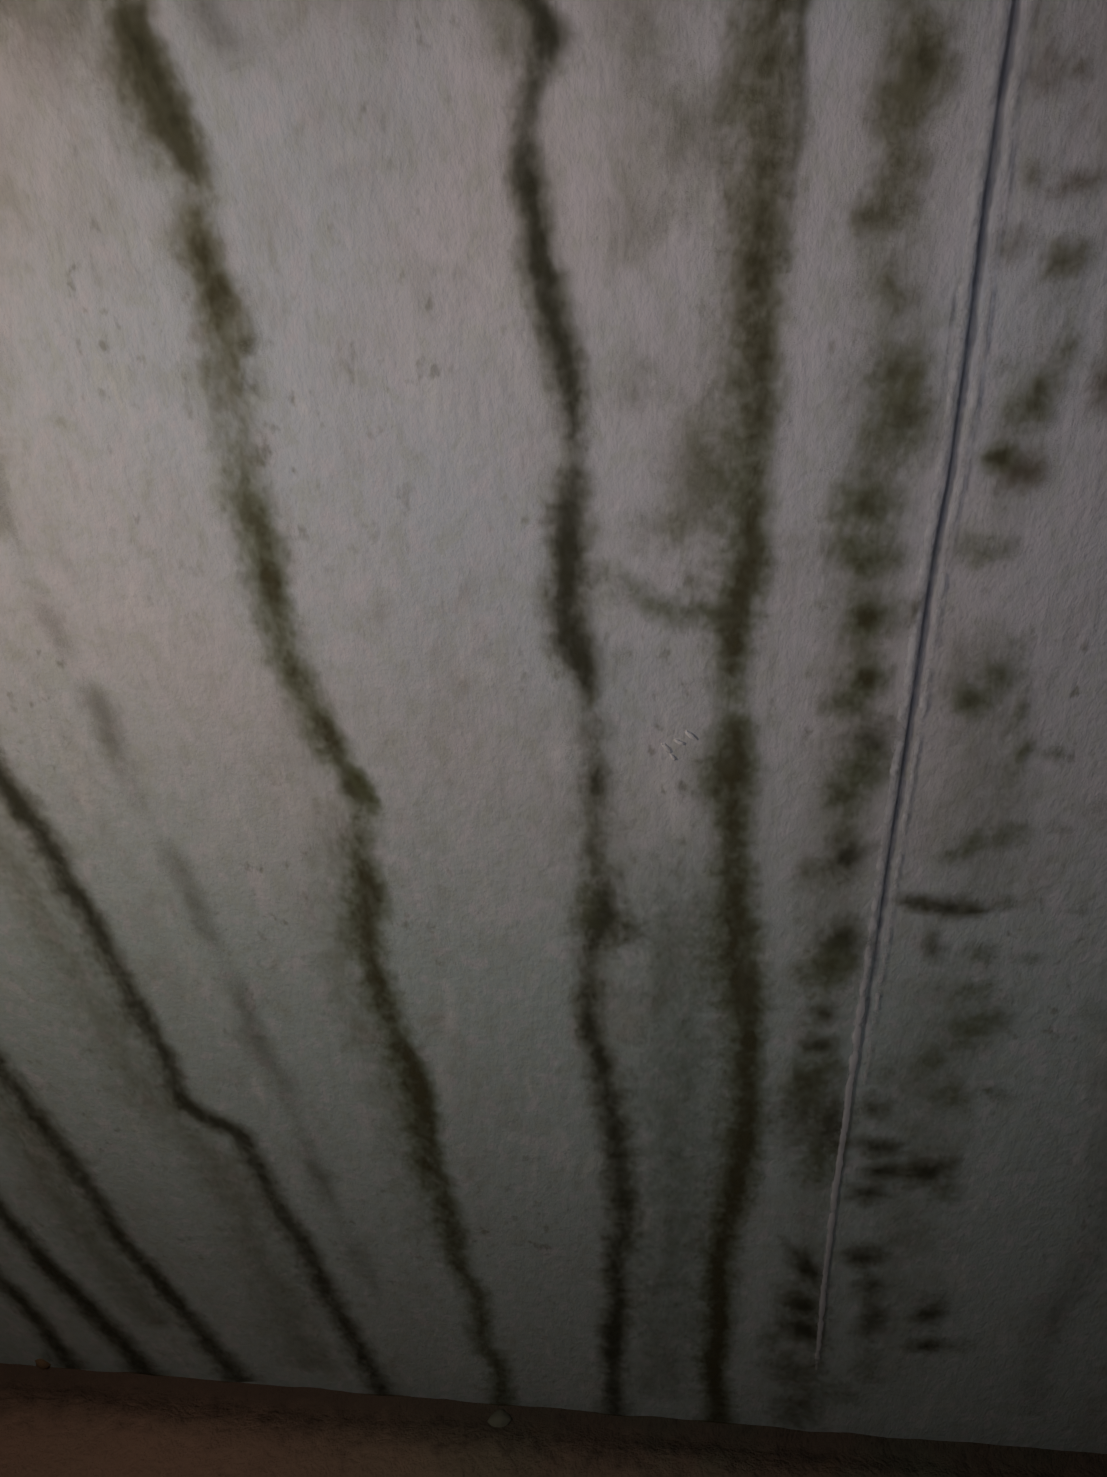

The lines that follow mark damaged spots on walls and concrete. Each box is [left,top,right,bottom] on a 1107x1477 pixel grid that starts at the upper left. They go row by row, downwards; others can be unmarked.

water stain [113,0,207,186]
water stain [0,762,392,1396]
water stain [187,207,238,366]
water stain [237,479,511,1406]
water stain [511,0,582,445]
water stain [548,465,595,699]
water stain [577,844,635,1416]
water stain [650,0,806,694]
water stain [700,715,763,1424]
water stain [851,602,886,633]
crack [815,0,1032,1363]
water stain [900,897,982,916]